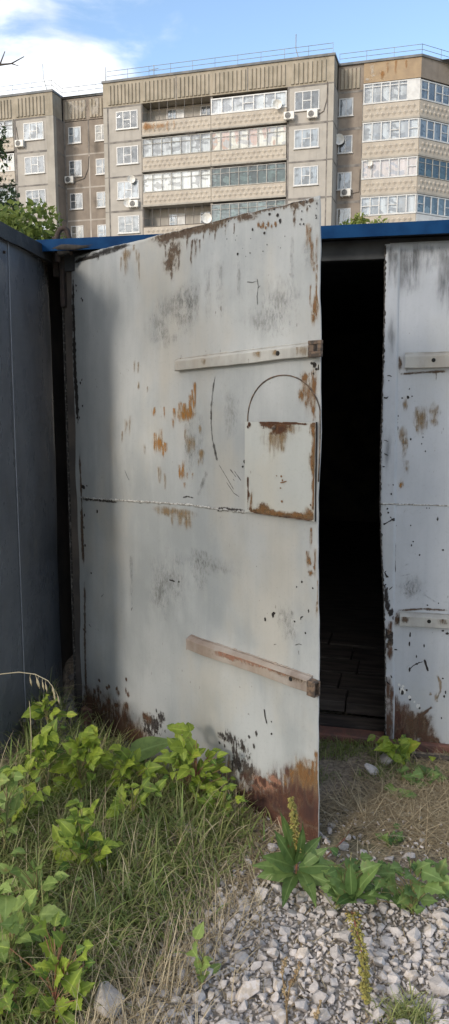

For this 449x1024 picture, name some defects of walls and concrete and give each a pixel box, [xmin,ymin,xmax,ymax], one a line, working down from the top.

rust [152,198,318,322]
rust [153,383,203,463]
rust [399,401,437,444]
rust [163,507,190,528]
rust [247,370,318,612]
rust [386,677,442,743]
rust [220,752,319,842]